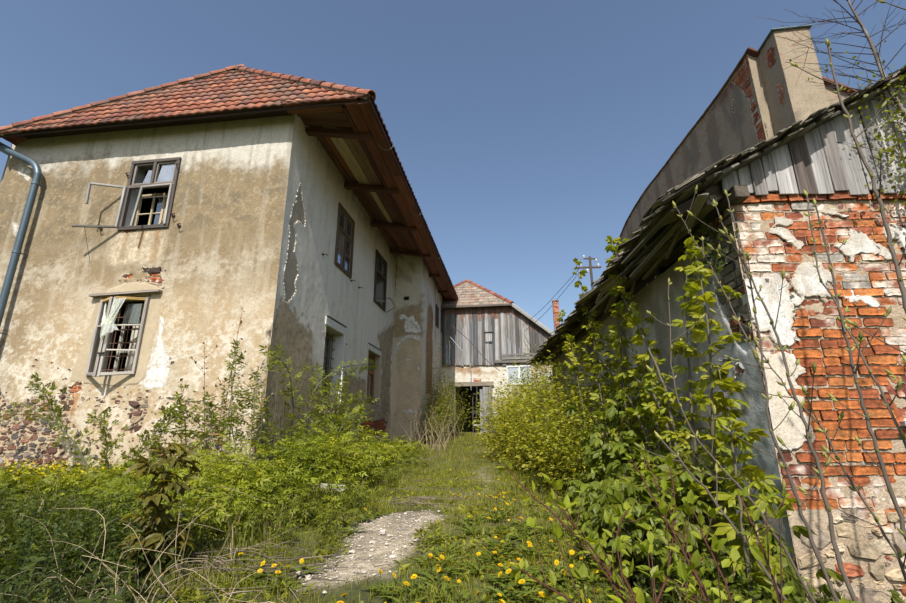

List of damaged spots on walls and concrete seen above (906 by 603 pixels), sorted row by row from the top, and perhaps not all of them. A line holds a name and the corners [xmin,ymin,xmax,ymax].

water stain [108,229,167,266]
flaking render [119,265,167,289]
peeling [247,183,389,467]
peeling [393,314,421,370]
flaking render [701,191,906,533]